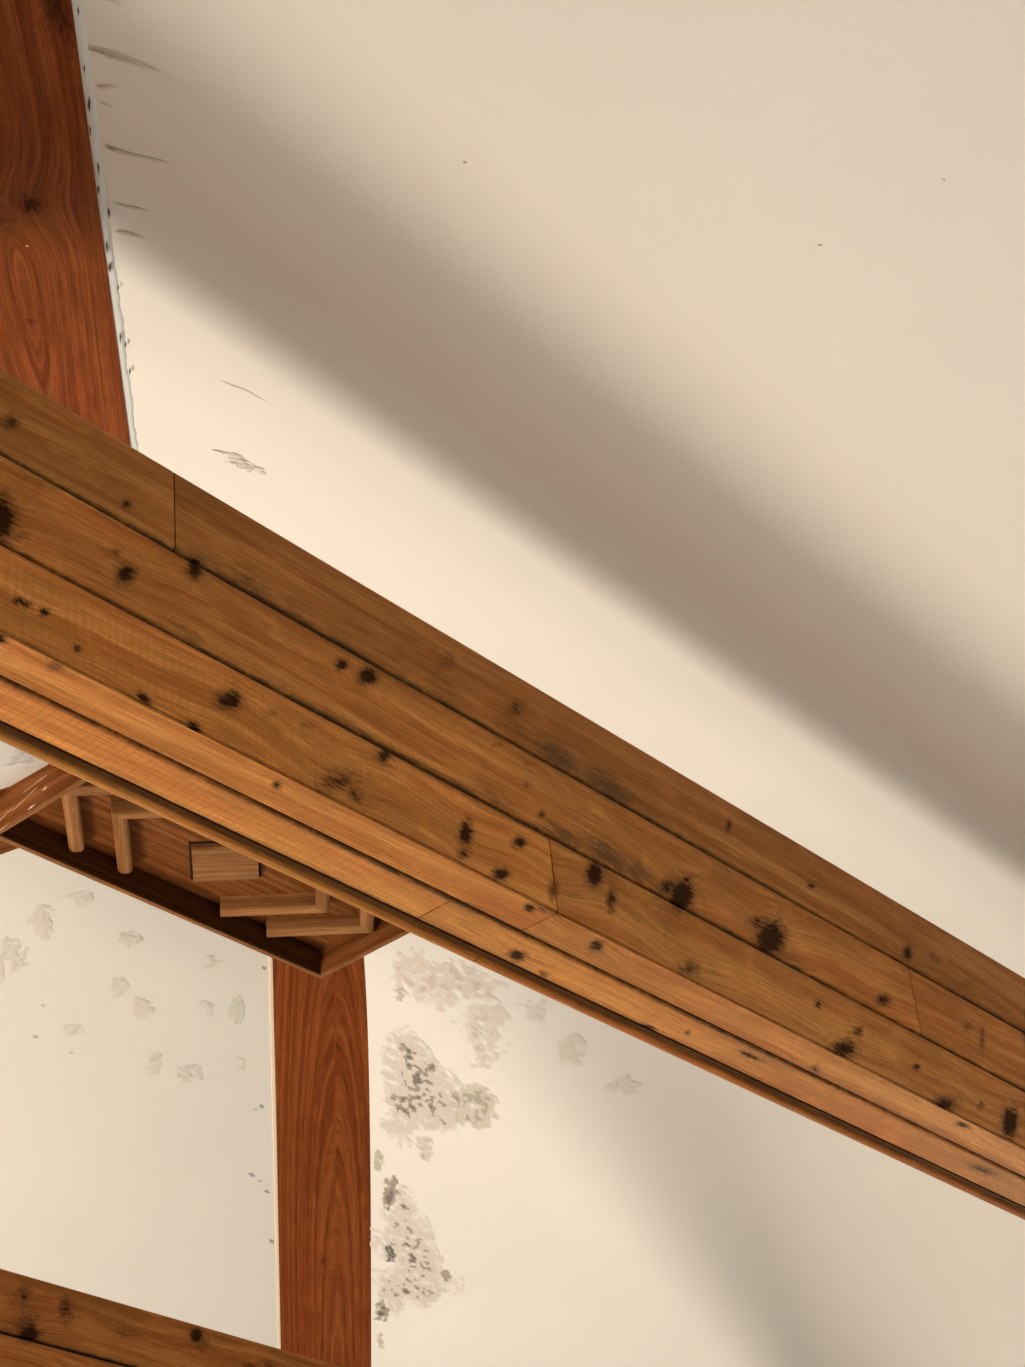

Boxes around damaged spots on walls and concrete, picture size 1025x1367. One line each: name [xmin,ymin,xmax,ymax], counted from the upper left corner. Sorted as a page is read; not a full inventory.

mould [379,946,588,1165]
mould [370,1149,465,1354]